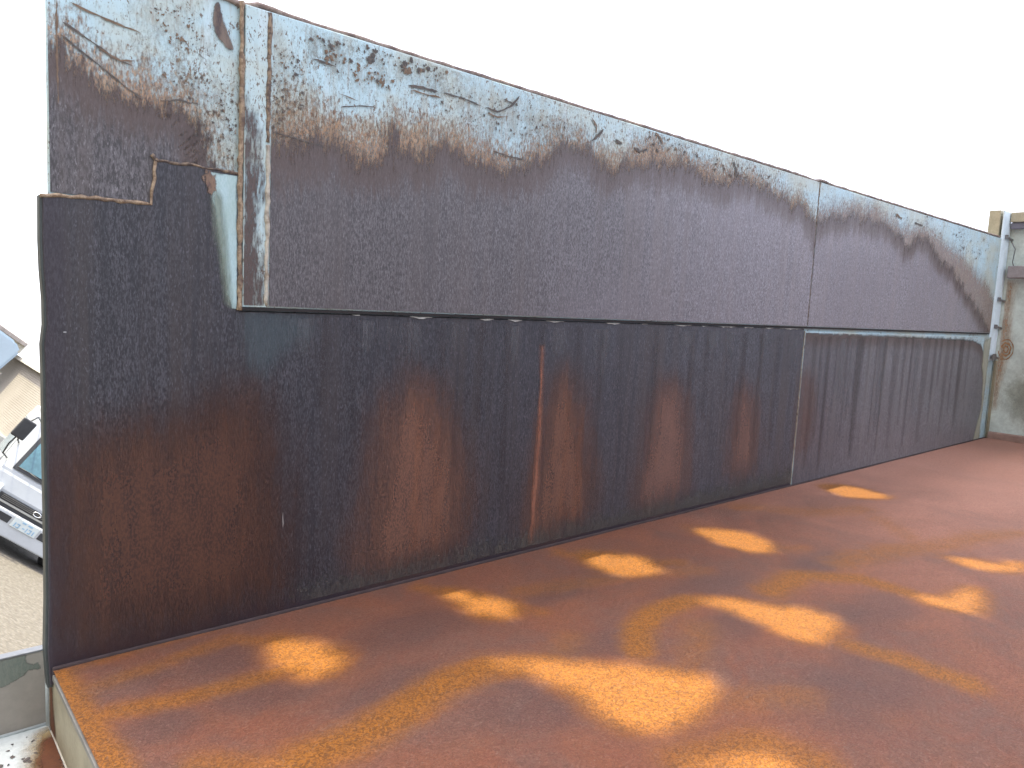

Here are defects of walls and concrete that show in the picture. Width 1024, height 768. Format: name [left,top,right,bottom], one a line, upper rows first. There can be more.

corrosion [47,7,229,203]
peeling [150,8,203,54]
peeling [162,72,237,160]
peeling [213,2,233,50]
peeling [271,44,305,128]
peeling [309,35,572,136]
corrosion [235,90,1014,484]
corrosion [369,389,465,570]
corrosion [528,347,586,544]
corrosion [641,387,686,506]